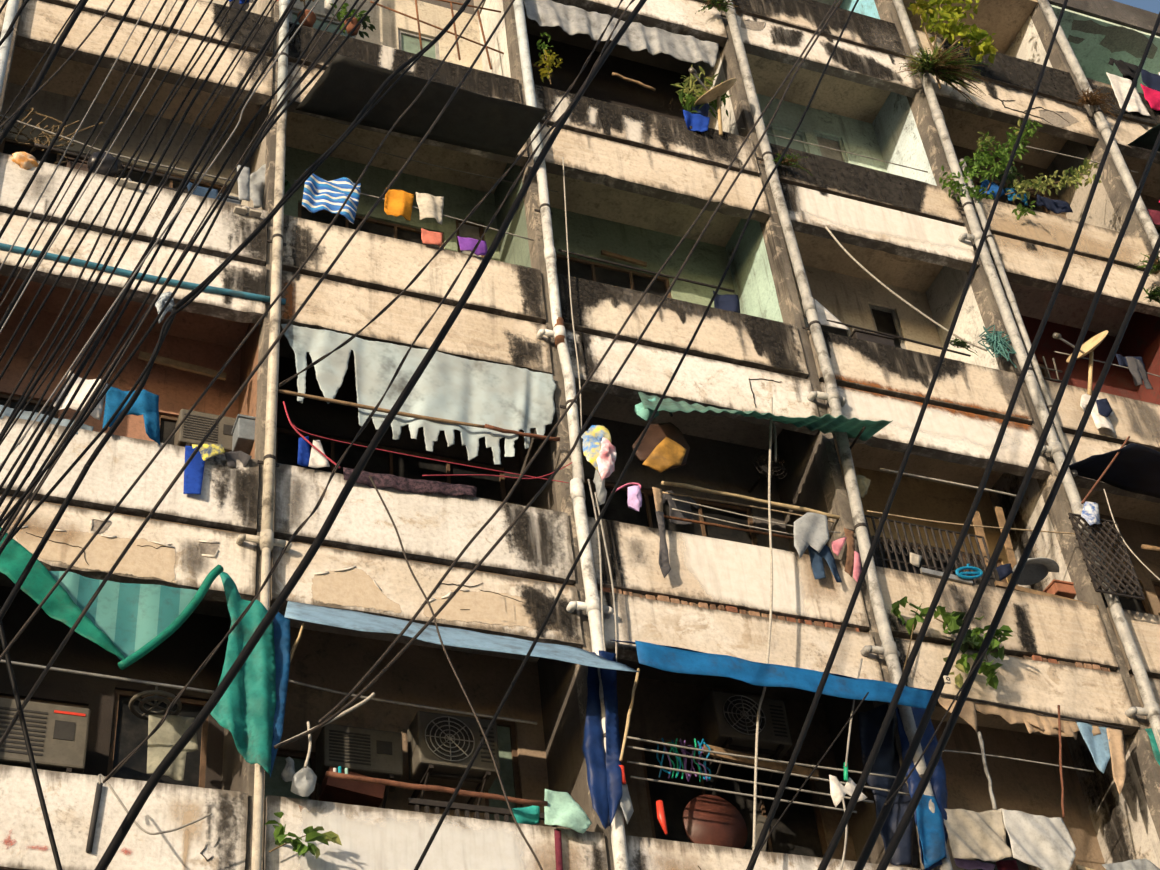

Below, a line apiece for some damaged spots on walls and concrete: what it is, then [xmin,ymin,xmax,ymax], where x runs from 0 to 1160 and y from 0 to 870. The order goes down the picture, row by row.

damp [535,85,742,170]
damp [222,216,267,304]
damp [282,217,322,281]
peeling [13,517,176,583]
peeling [198,540,219,559]
damp [209,457,258,521]
peeling [311,566,402,613]
damp [503,502,579,639]
damp [999,477,1035,559]
damp [1013,604,1037,653]
damp [182,793,243,867]